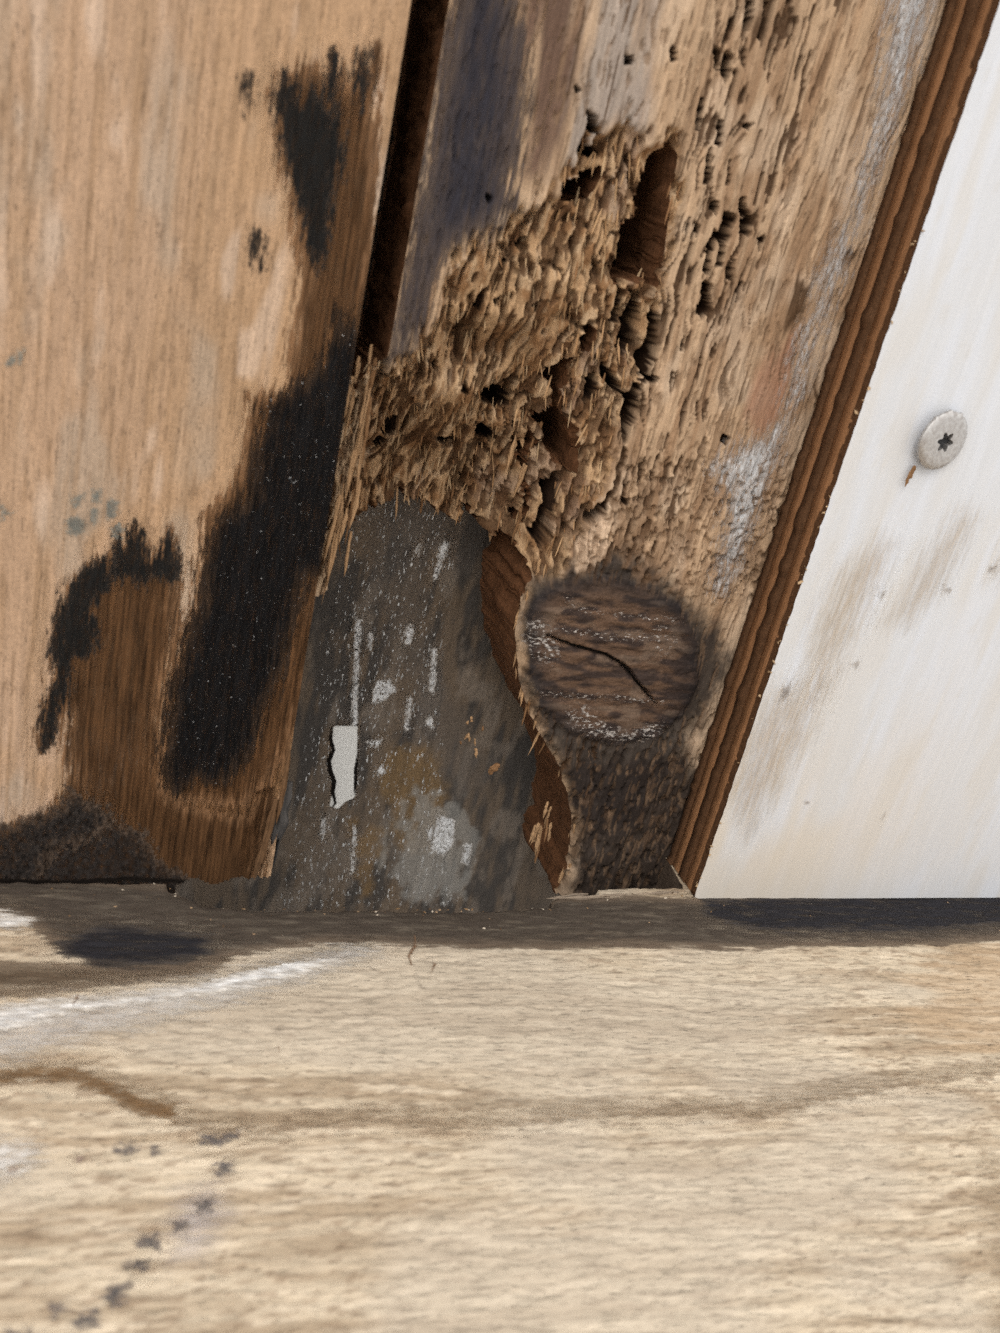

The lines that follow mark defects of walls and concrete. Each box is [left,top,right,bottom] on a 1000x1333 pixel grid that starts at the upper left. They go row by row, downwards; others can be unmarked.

spalling [351,0,449,390]
spalling [559,165,605,202]
spalling [609,141,678,287]
water stain [0,0,1000,1054]
spalling [426,324,597,894]
crack [548,634,652,700]
water stain [0,1066,179,1125]